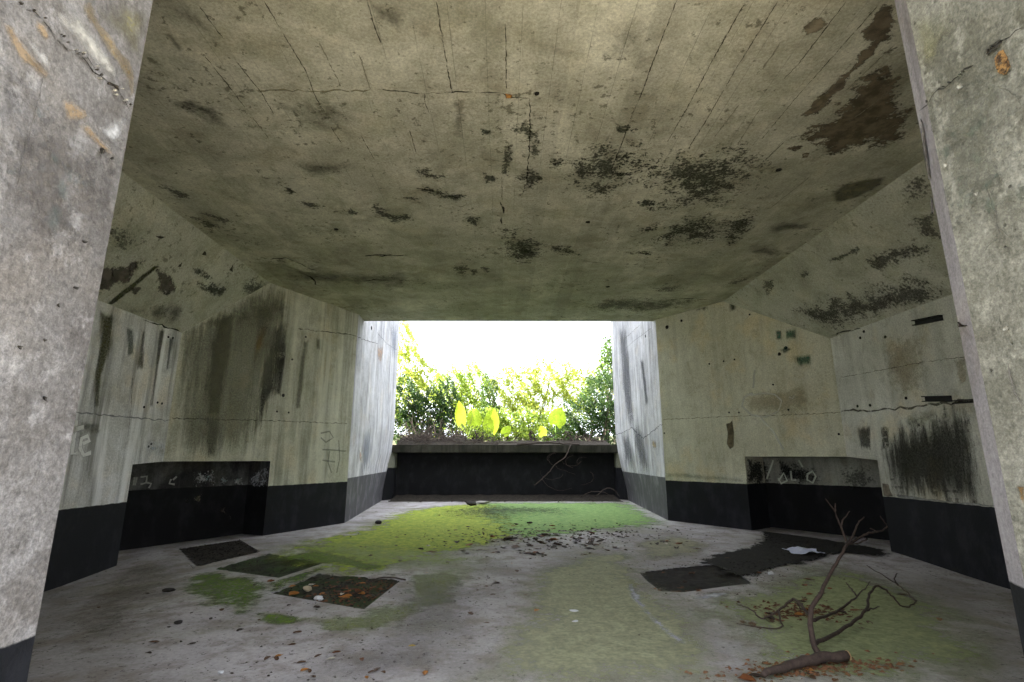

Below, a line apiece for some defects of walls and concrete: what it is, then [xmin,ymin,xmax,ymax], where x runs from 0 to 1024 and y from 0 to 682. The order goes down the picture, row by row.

crack [10,3,130,111]
corrosion [994,50,1011,75]
crack [256,89,531,179]
damp [403,167,466,201]
damp [483,123,772,255]
damp [100,260,145,294]
damp [156,263,226,296]
damp [500,228,580,264]
damp [793,213,942,330]
damp [184,278,285,454]
crack [617,399,973,438]
damp [859,409,977,503]